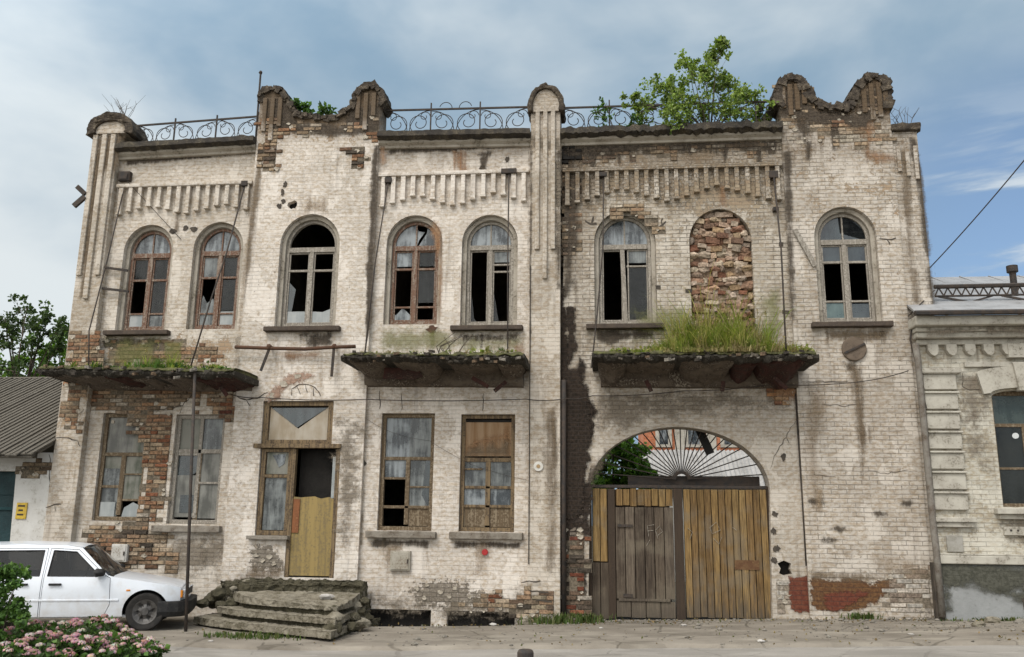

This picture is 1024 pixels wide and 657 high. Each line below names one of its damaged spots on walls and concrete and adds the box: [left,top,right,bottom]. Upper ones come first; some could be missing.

spalling [254,115,328,172]
spalling [339,116,379,169]
spalling [561,87,897,256]
damp [565,306,586,380]
spalling [38,331,236,574]
damp [580,454,608,536]
spalling [422,501,592,622]